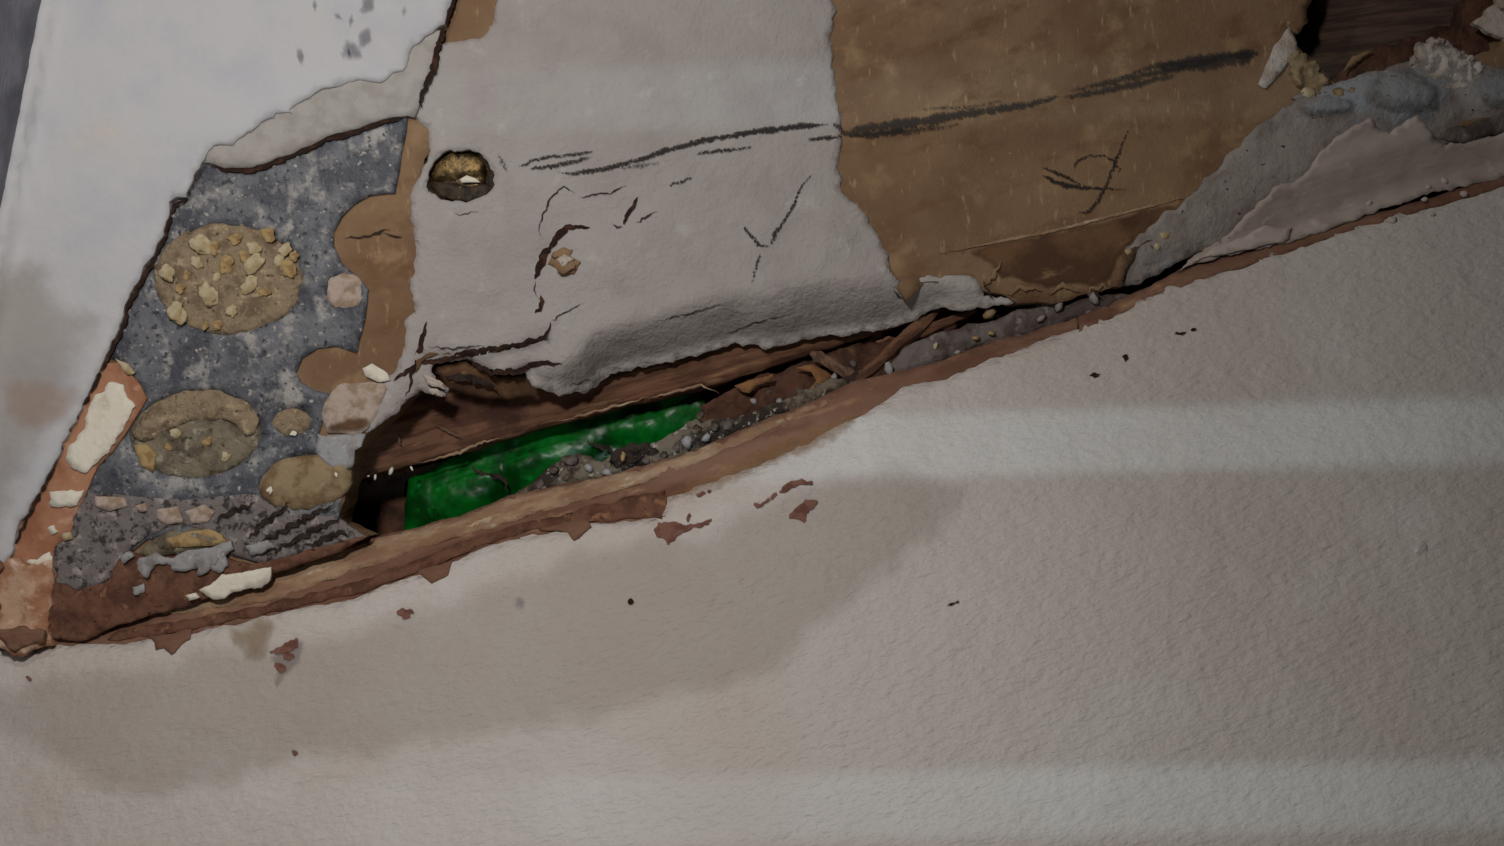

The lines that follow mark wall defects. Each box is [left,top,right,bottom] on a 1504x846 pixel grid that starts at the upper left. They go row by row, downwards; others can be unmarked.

damp [346,19,369,54]
spalling [1258,0,1330,94]
spalling [1449,0,1504,56]
crack [394,186,654,396]
crack [660,305,784,333]
spalling [0,115,1504,657]
spalling [270,638,298,673]